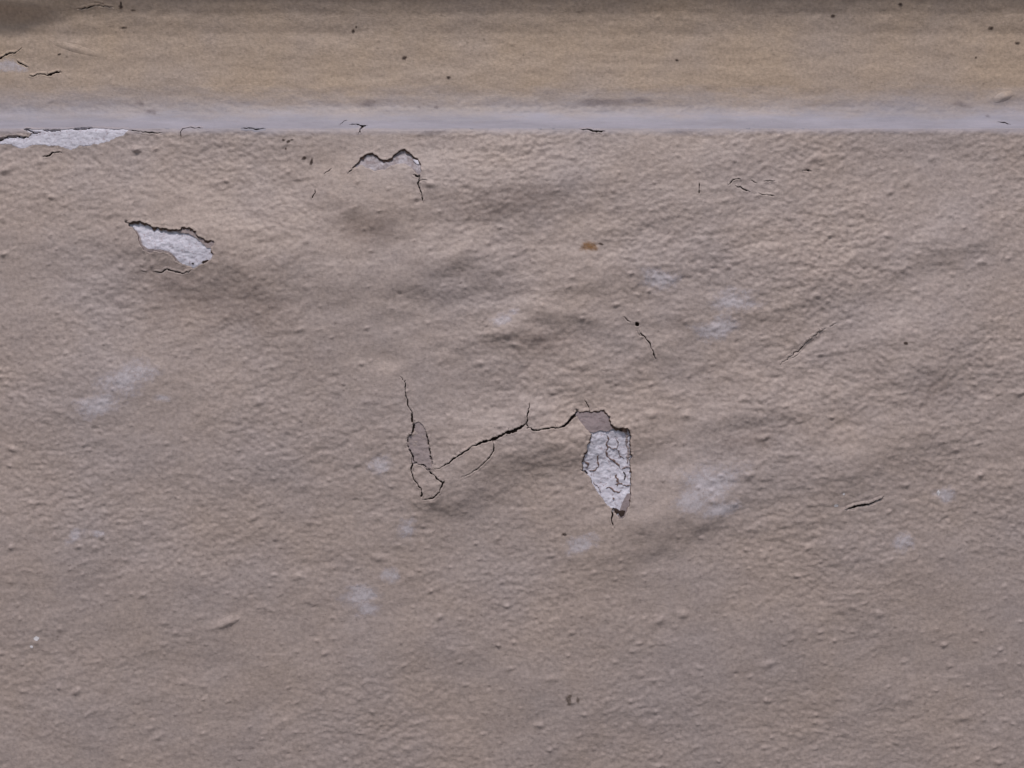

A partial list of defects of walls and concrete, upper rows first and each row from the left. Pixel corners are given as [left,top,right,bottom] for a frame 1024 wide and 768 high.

peeling [0,126,132,159]
peeling [346,146,428,203]
peeling [125,218,217,276]
crack [623,314,659,361]
crack [434,402,578,480]
peeling [576,399,635,530]